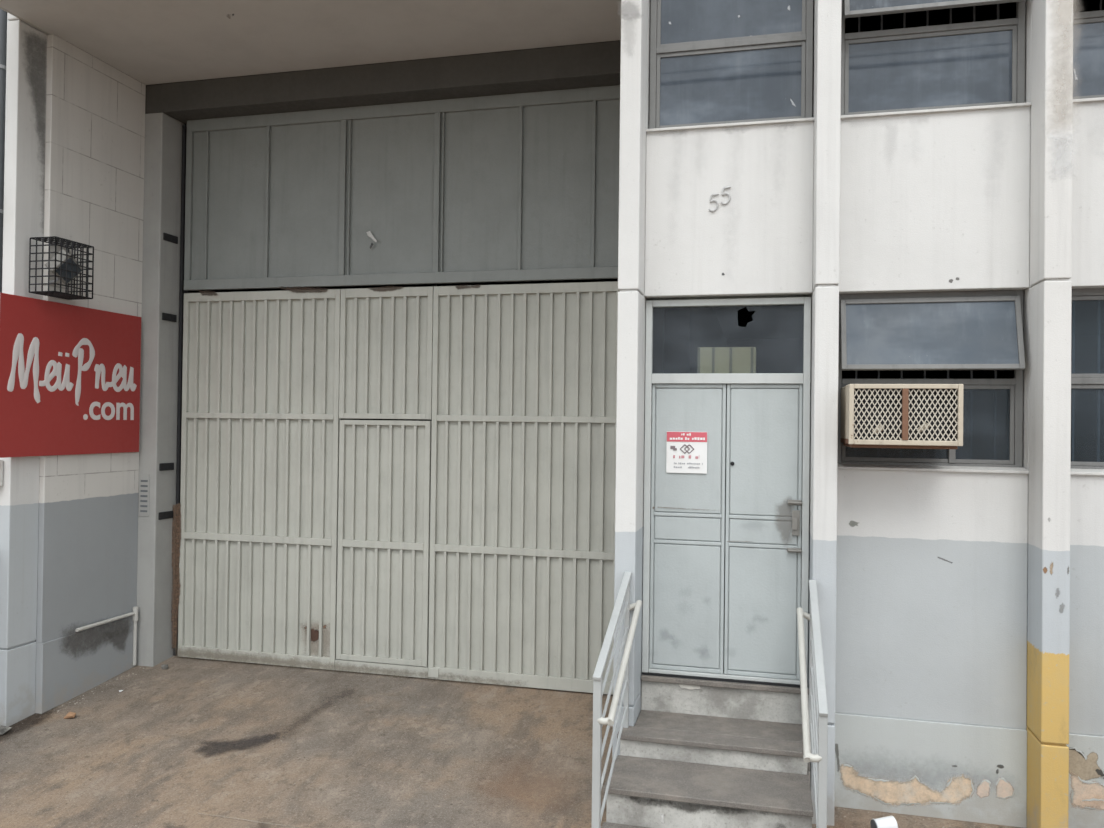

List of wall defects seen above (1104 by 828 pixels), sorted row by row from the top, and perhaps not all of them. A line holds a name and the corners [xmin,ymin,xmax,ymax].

damp [65,620,129,653]
peeling [835,744,1015,806]
peeling [1069,747,1104,810]